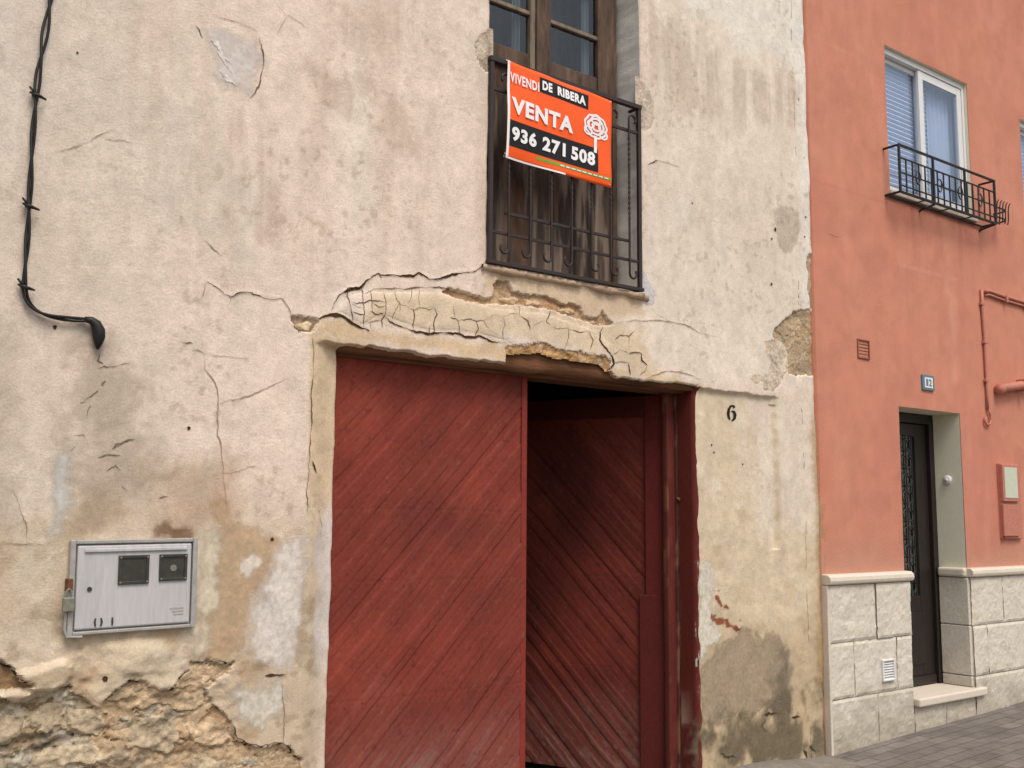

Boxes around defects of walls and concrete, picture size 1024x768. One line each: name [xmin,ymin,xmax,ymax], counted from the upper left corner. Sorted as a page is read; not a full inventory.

crack [180,341,287,494]
crack [306,264,716,529]
flaking render [442,281,610,326]
flaking render [505,342,610,372]
flaking render [750,254,812,392]
flaking render [0,500,301,768]
peeling [711,595,740,631]
leakage [695,668,826,765]